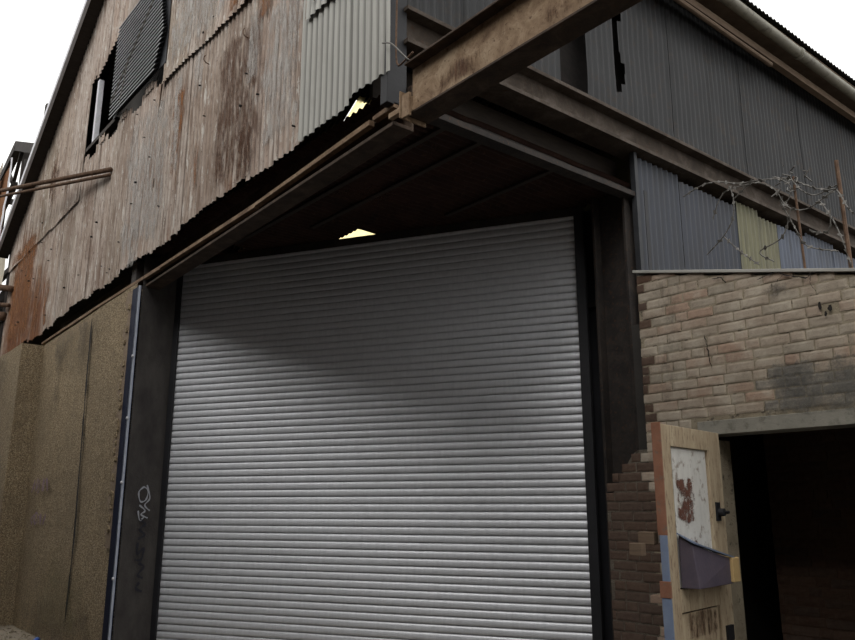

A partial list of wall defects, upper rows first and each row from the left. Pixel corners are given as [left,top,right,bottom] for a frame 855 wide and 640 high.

corrosion [215,0,269,181]
corrosion [6,234,50,342]